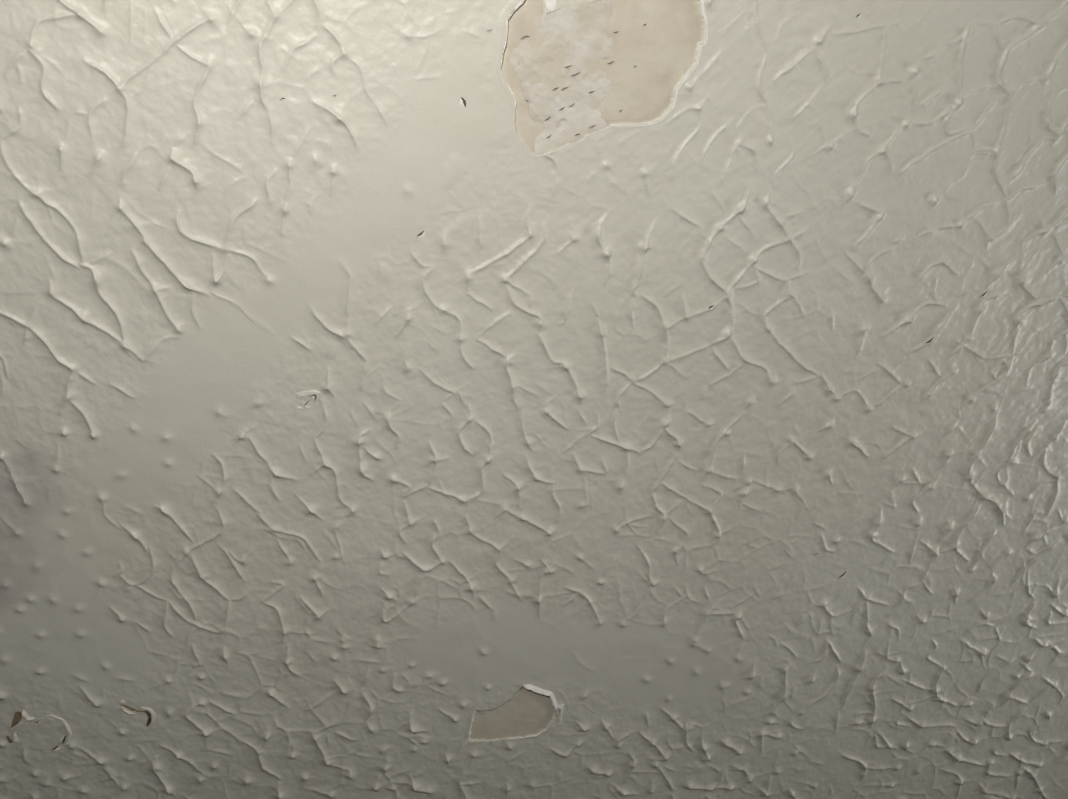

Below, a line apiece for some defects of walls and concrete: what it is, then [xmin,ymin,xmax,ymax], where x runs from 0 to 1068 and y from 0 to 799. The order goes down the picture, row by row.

peeling [495,0,710,157]
peeling [458,684,565,751]